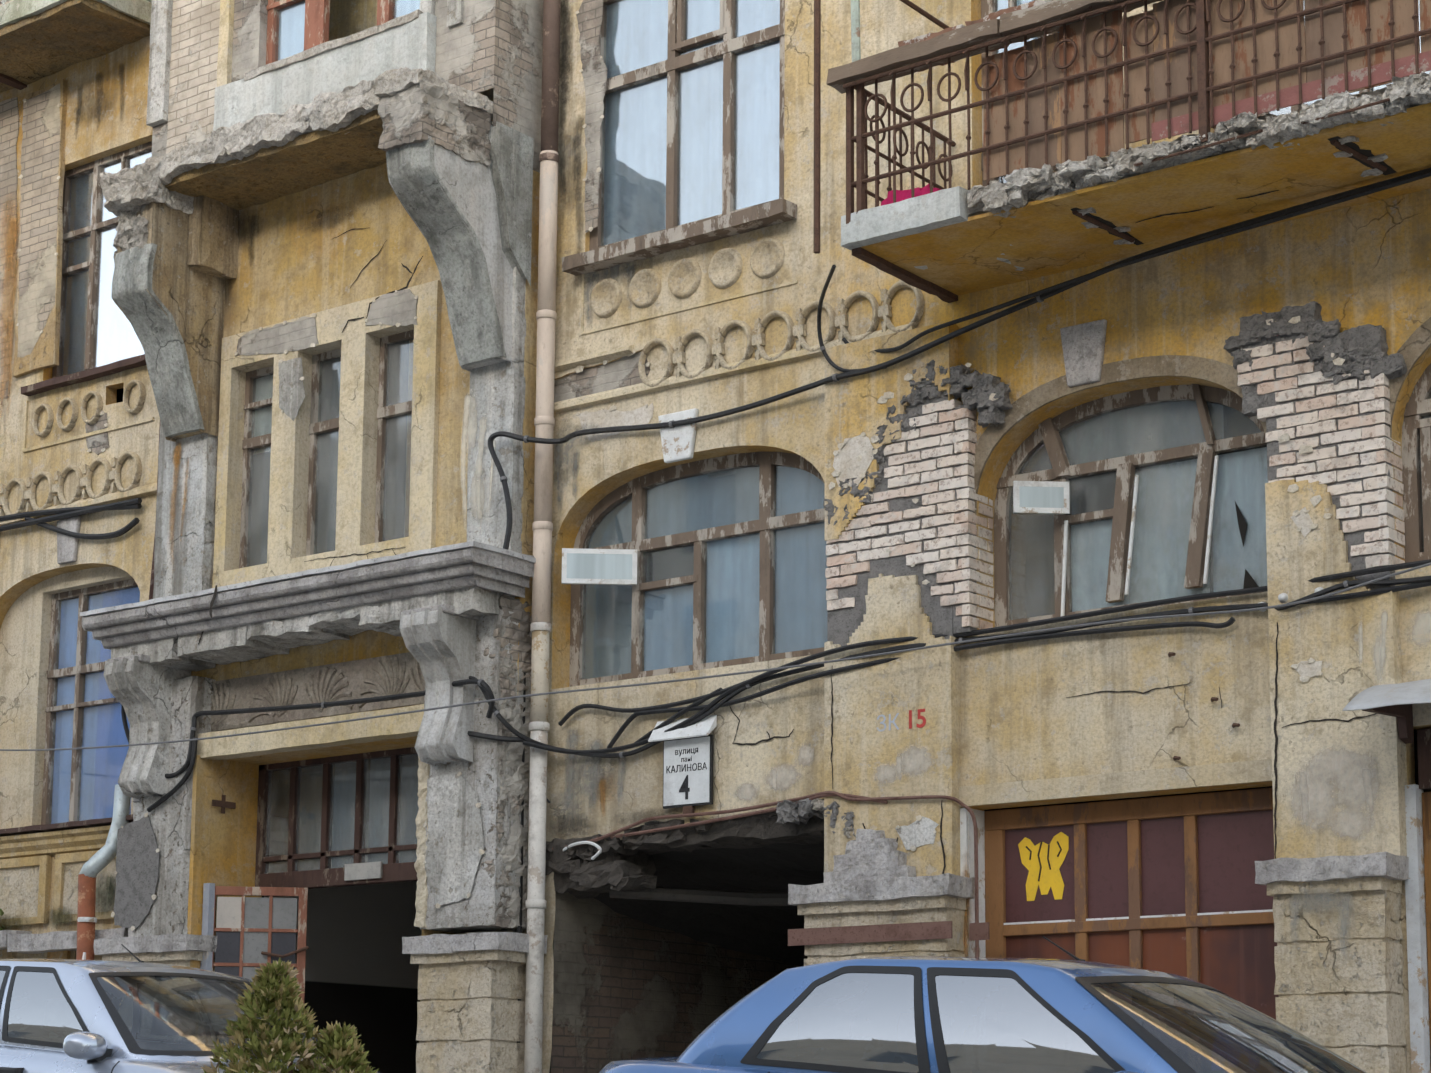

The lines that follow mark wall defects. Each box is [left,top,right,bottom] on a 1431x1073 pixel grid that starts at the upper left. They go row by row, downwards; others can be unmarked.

flaking render [0,83,61,404]
spalling [100,67,493,264]
flaking render [365,289,418,327]
spalling [1071,207,1144,245]
spalling [966,71,1431,218]
flaking render [823,360,1013,634]
flaking render [1223,314,1407,568]
flaking render [414,594,532,932]
flaking render [545,819,713,892]
peeling [895,815,939,851]
crack [1066,683,1222,708]
crack [1274,622,1377,859]